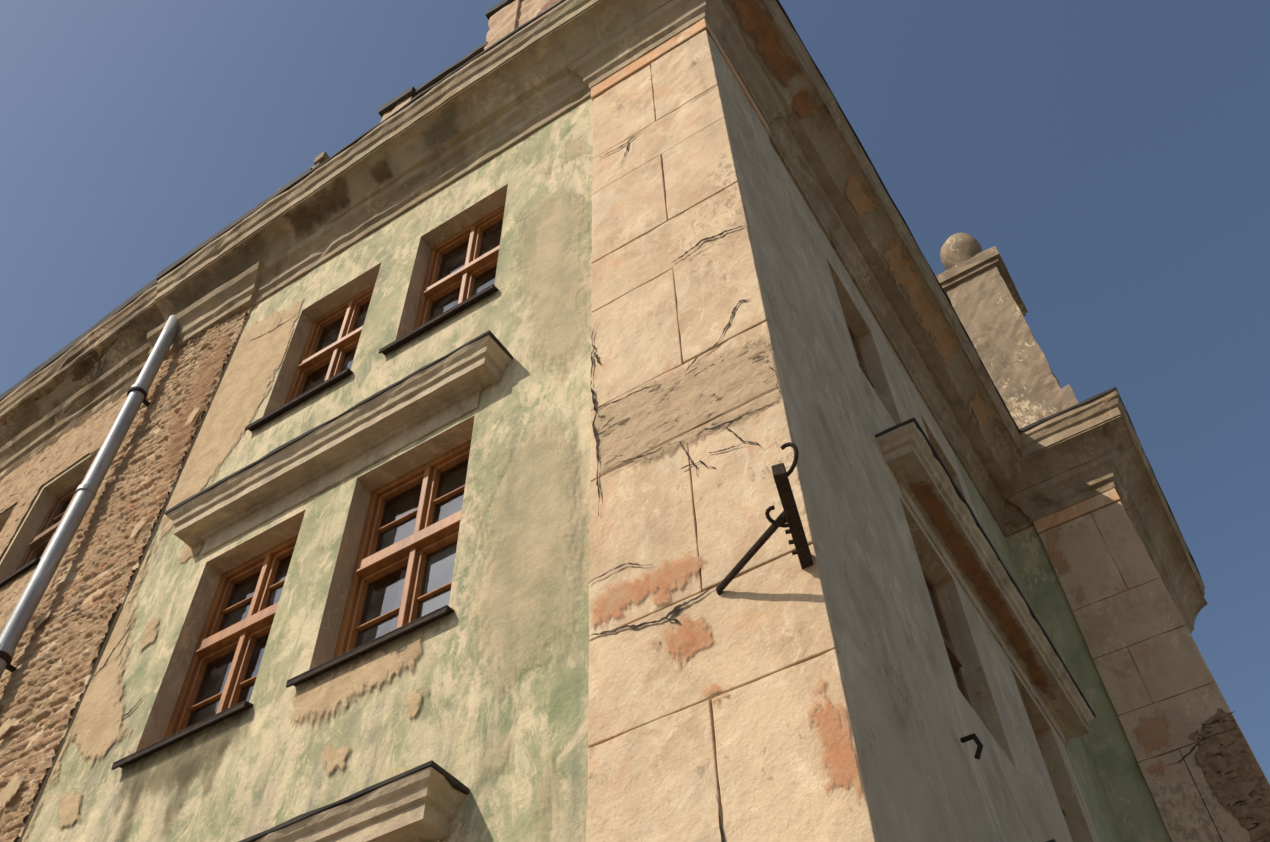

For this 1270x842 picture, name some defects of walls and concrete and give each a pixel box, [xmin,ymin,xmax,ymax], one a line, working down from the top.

crack [601,126,648,164]
crack [672,225,746,263]
spalling [0,297,304,842]
peeling [591,547,707,628]
peeling [648,614,714,673]
peeling [808,678,863,809]
spalling [1188,707,1270,842]
crack [716,796,724,842]